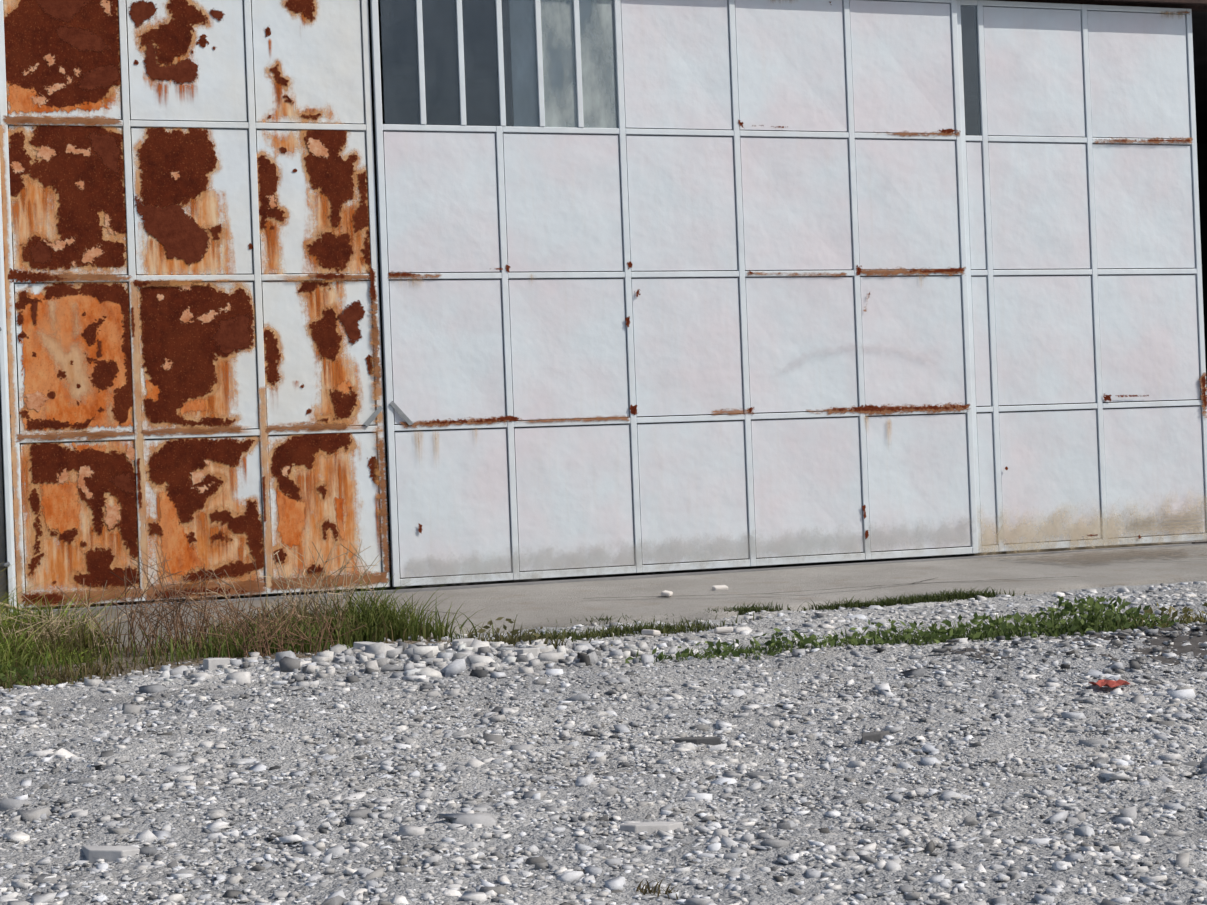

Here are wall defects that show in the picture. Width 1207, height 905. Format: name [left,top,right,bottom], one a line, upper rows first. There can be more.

rust [748,265,964,277]
rust [0,0,441,607]
rust [400,404,638,428]
rust [806,403,970,415]